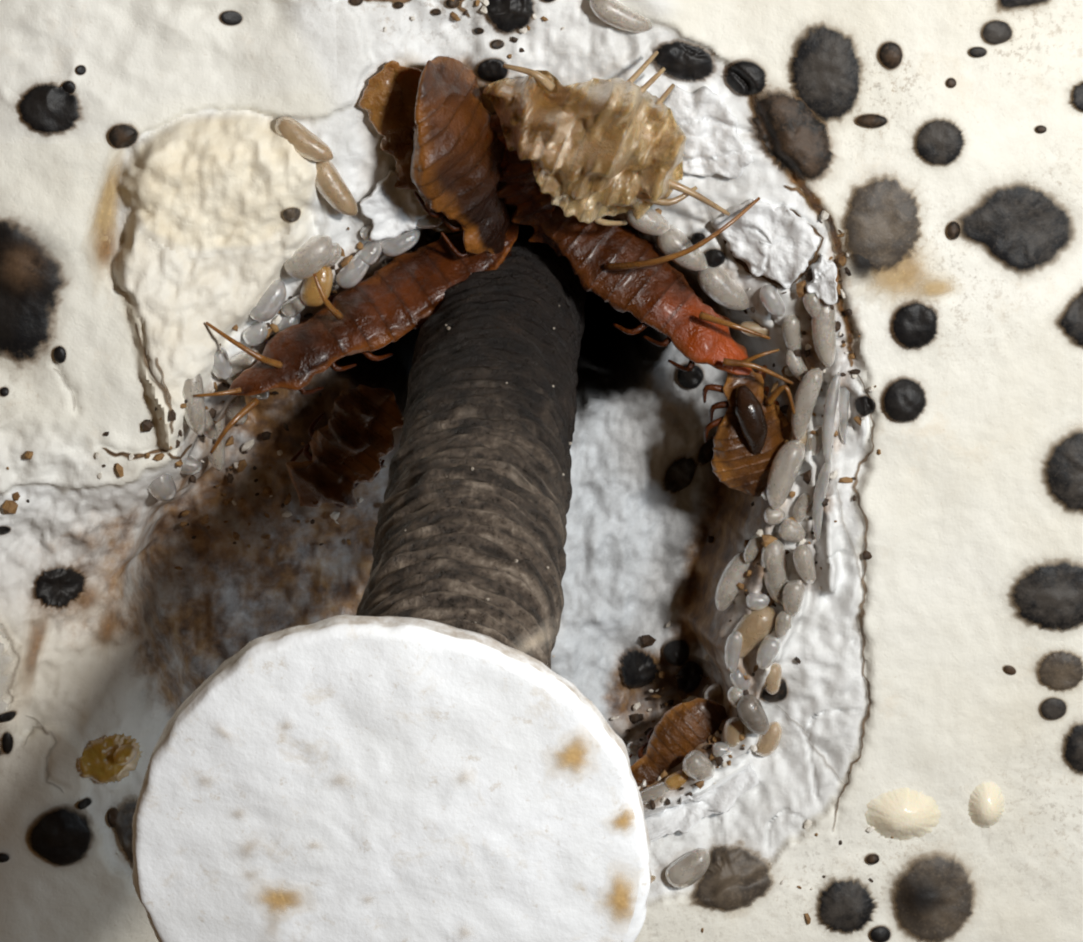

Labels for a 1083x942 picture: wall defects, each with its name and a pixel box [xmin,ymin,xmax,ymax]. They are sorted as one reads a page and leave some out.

spalling [0,0,875,907]
leakage [431,0,462,15]